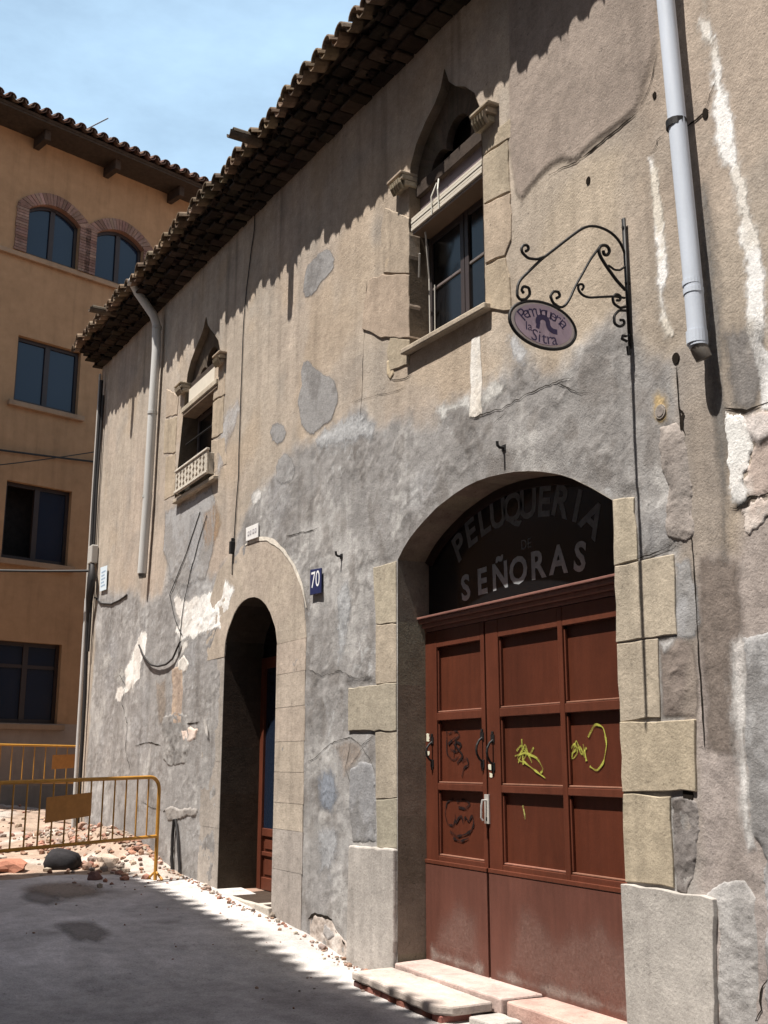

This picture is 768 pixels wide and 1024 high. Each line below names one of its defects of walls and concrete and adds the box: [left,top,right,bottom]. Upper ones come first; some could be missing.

crack [554,56,657,173]
water stain [648,158,674,337]
water stain [698,18,768,497]
crack [471,378,588,420]
peeling [725,402,768,535]
peeling [102,631,147,702]
peeling [157,579,234,742]
water stain [660,550,755,849]